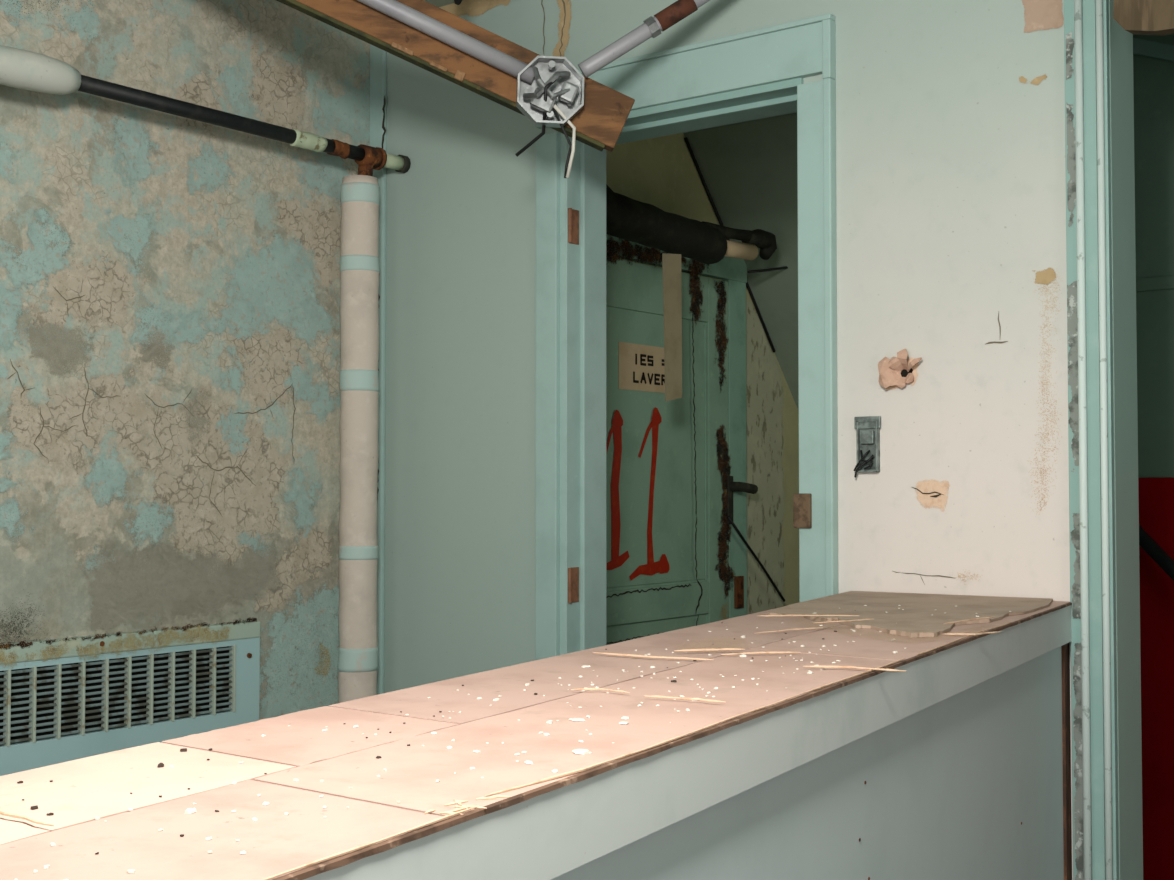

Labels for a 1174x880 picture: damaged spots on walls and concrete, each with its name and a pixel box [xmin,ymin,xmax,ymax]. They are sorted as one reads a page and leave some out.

peeling [175,44,312,130]
rust [606,236,712,324]
flaking render [878,349,922,390]
crack [8,360,192,459]
crack [234,383,296,460]
crack [196,452,256,516]
flaking render [912,479,950,512]
rust [0,617,257,669]